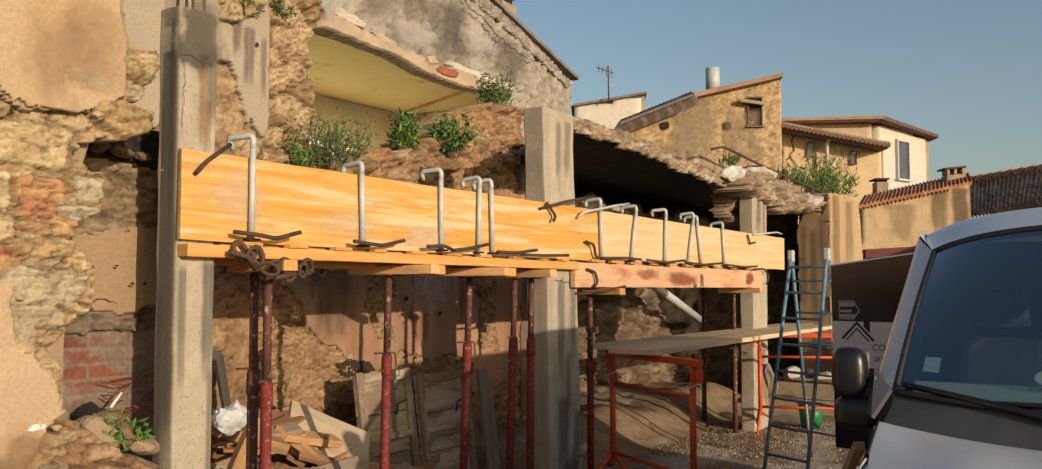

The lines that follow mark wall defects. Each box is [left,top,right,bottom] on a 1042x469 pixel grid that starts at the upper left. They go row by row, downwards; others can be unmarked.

spalling [0,47,160,431]
spalling [258,274,355,410]
spalling [364,275,409,339]
spalling [376,351,475,393]